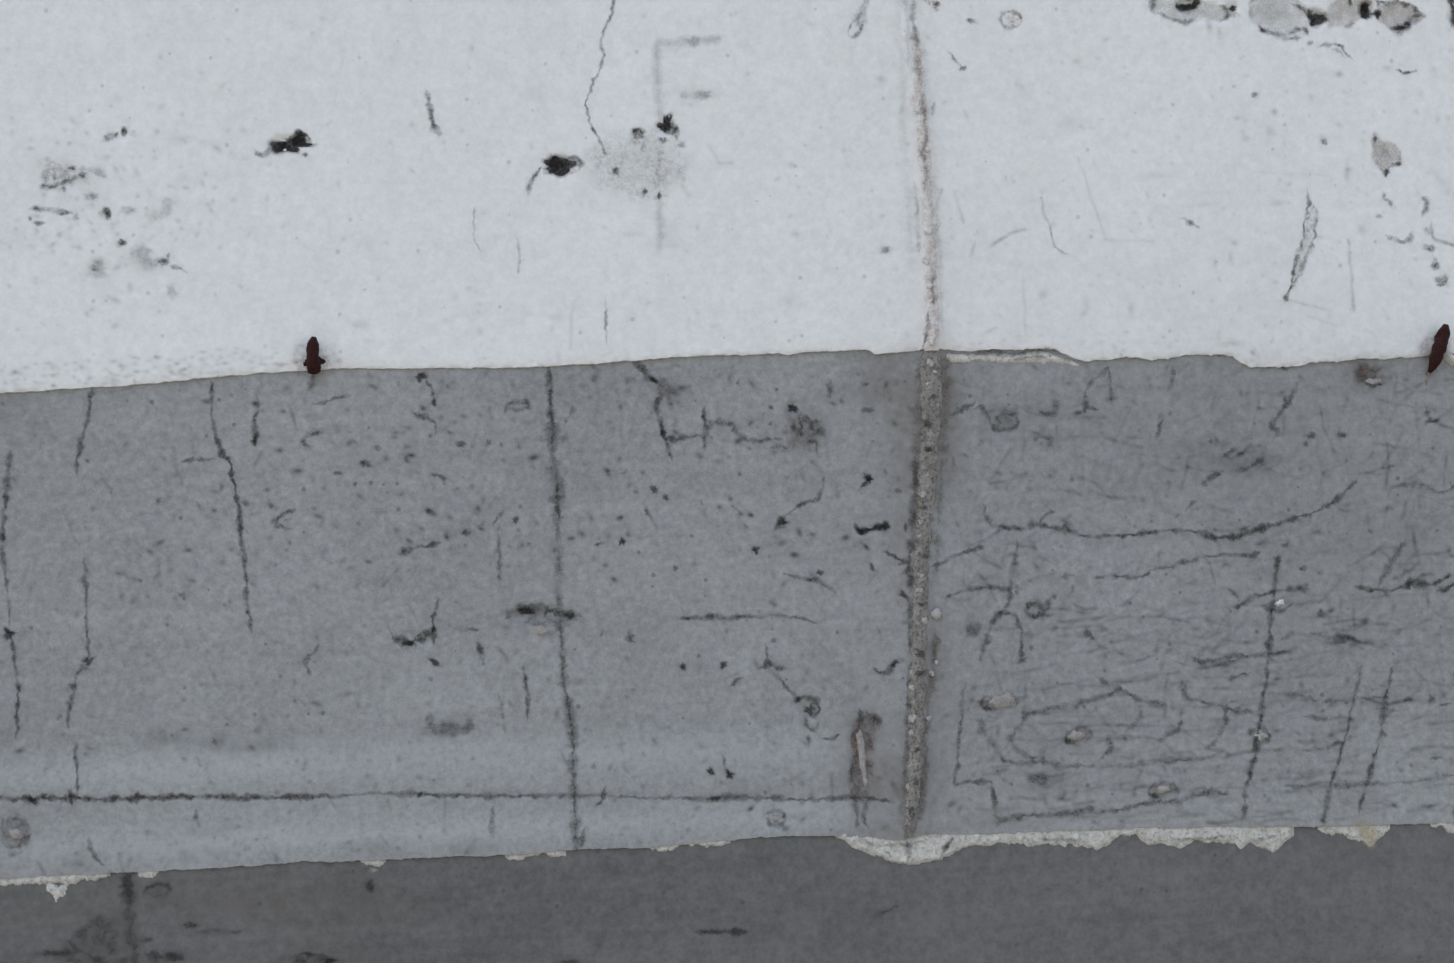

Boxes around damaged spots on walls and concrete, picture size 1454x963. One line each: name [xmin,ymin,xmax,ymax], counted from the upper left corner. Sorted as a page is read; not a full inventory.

spalling [1151,0,1236,22]
spalling [1254,0,1418,39]
hole [259,129,312,156]
hole [528,156,582,187]
spalling [633,114,678,143]
crack [638,365,770,456]
crack [185,384,257,626]
crack [1,454,20,734]
crack [11,586,347,804]
peeling [835,711,1294,865]
crack [870,484,1353,821]
crack [1322,668,1392,822]